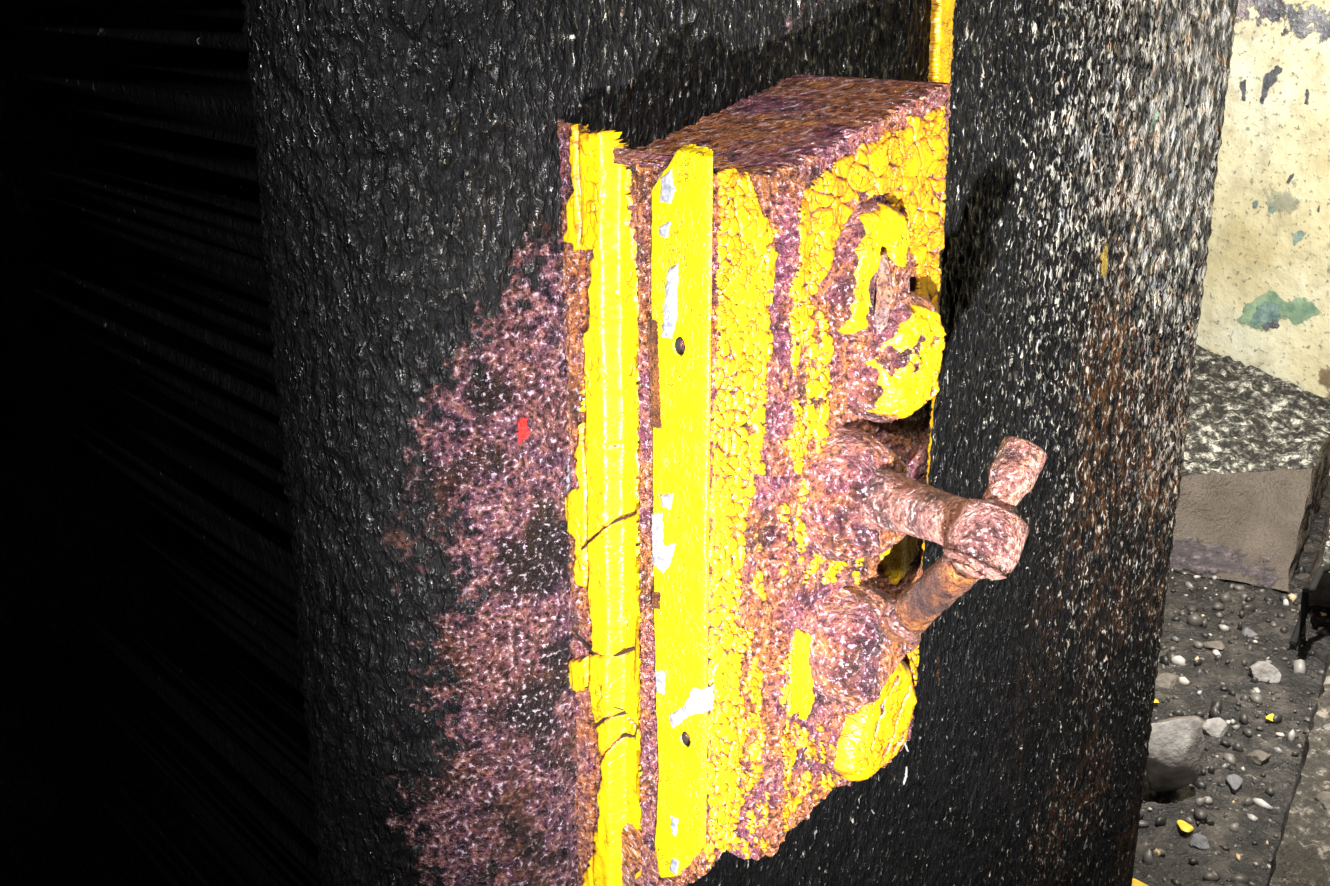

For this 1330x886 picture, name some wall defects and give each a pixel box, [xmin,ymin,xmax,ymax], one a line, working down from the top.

spalling [1234,0,1330,42]
rust [647,316,662,429]
rust [383,219,579,886]
crack [581,511,637,550]
peeling [564,124,678,886]
peeling [669,106,948,870]
rust [651,590,661,610]
crack [572,628,641,657]
crack [592,707,638,759]
peeling [670,858,680,875]